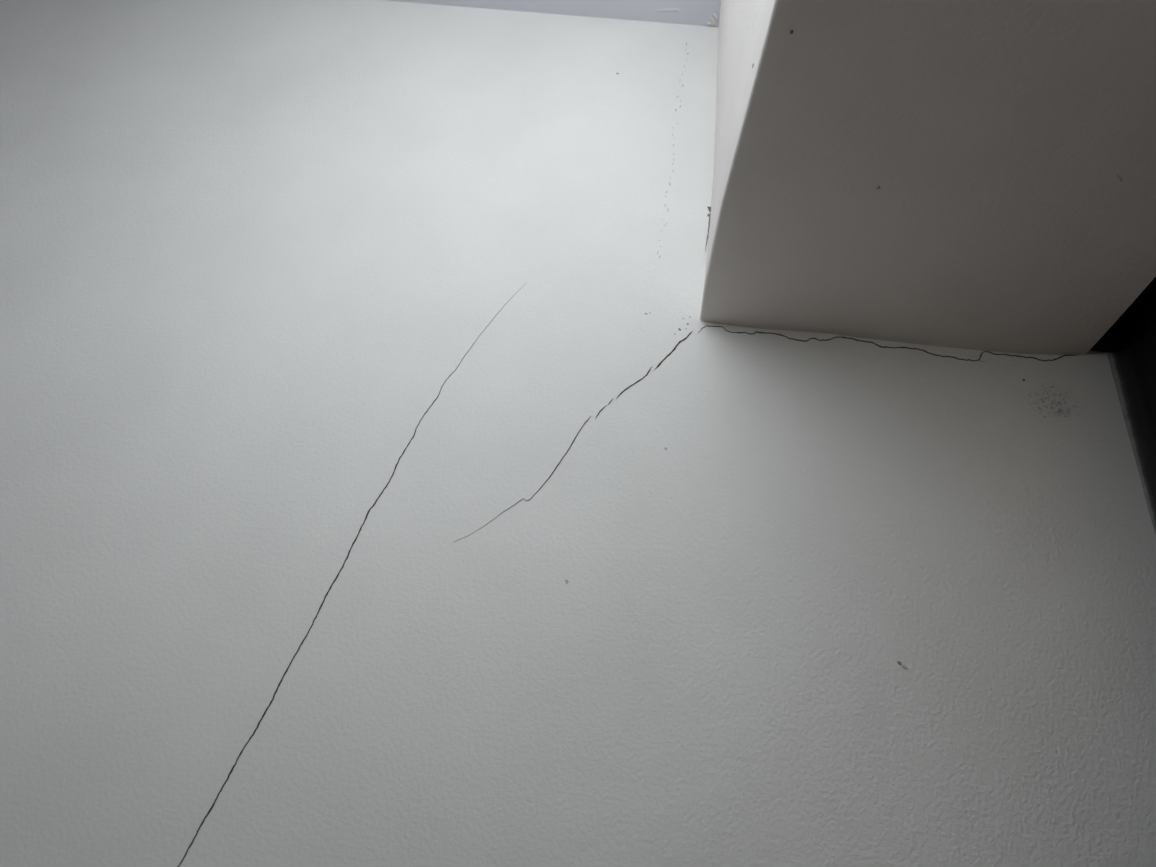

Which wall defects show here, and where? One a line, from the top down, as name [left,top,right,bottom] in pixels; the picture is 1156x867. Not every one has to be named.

crack [178,284,525,867]
crack [455,325,1077,542]